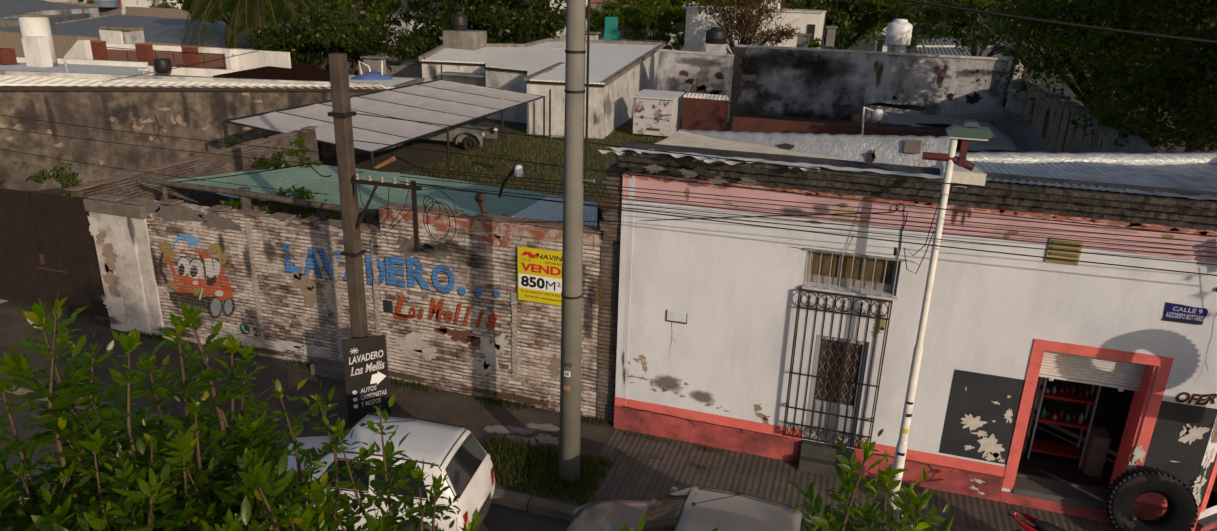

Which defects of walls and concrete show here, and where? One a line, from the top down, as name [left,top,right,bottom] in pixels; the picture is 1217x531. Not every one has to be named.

leakage [741,54,851,74]
peeling [88,216,130,317]
peeling [627,354,688,397]
peeling [961,395,1013,462]
peeling [1178,418,1217,505]